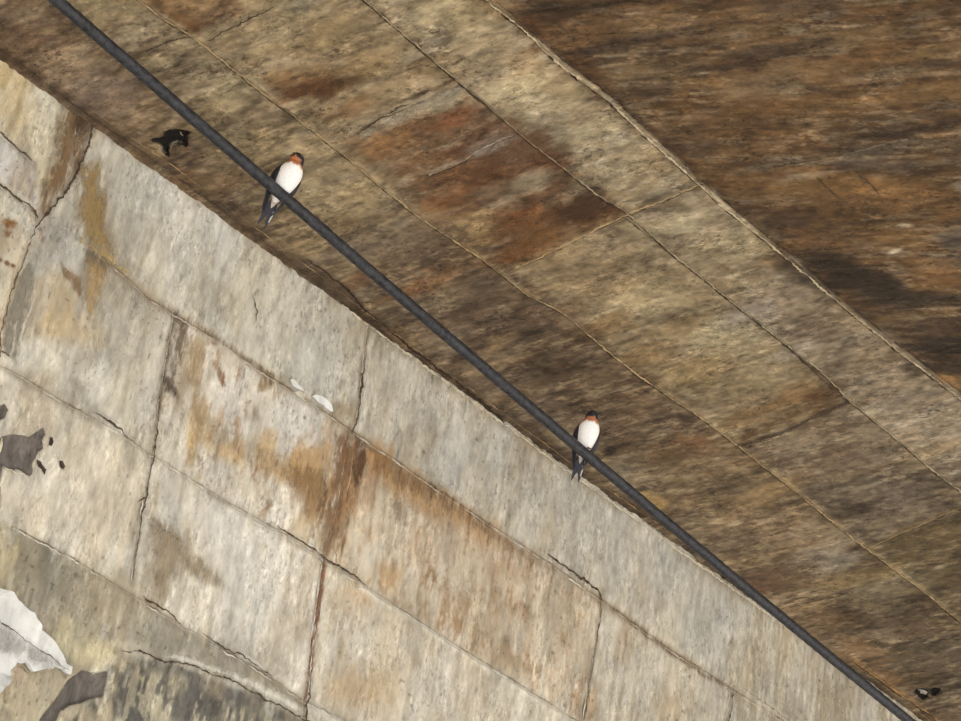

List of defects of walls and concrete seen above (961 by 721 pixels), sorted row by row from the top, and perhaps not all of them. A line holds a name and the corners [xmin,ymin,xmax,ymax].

spalling [0,428,53,512]
crack [96,413,128,438]
crack [133,322,174,576]
peeling [290,379,333,412]
crack [278,525,366,589]
peeling [0,586,72,693]
crack [144,596,181,624]
crack [39,671,107,721]
crack [125,633,313,721]
leakage [171,654,341,721]